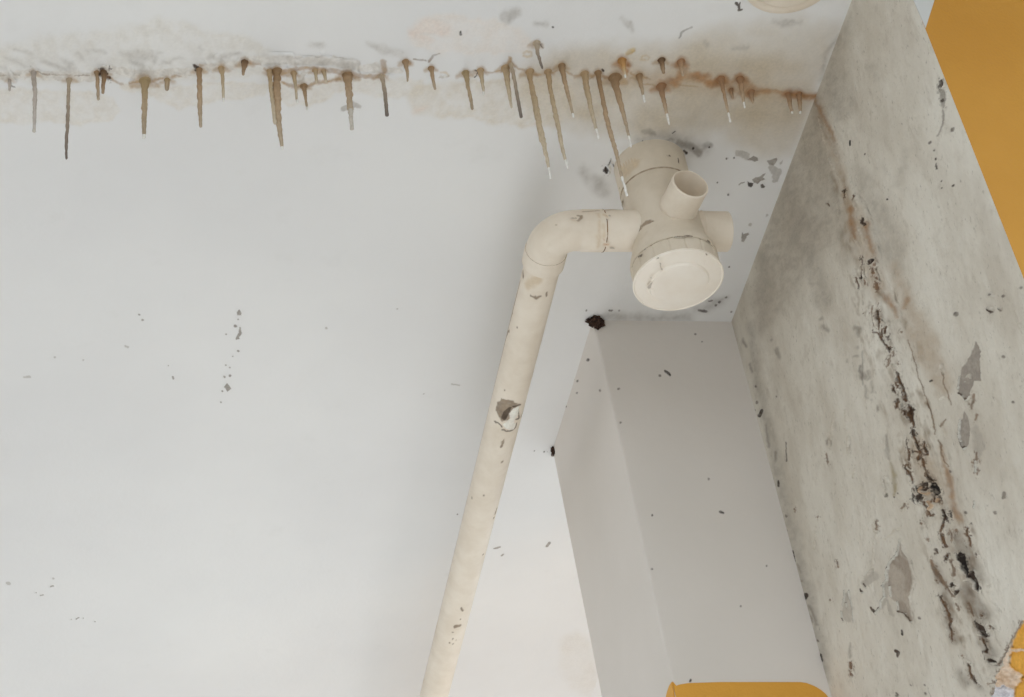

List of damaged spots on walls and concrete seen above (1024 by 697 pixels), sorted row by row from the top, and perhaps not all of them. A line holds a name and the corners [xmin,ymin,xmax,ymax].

water stain [0,11,283,129]
peeling [724,148,785,198]
rust [615,46,958,403]
crack [825,186,870,229]
water stain [280,4,860,697]
water stain [845,324,882,413]
crack [852,254,953,486]
peeling [956,339,987,480]
rust [903,432,967,526]
peeling [840,537,922,637]
flaking render [898,469,1024,697]
peeling [846,641,856,680]